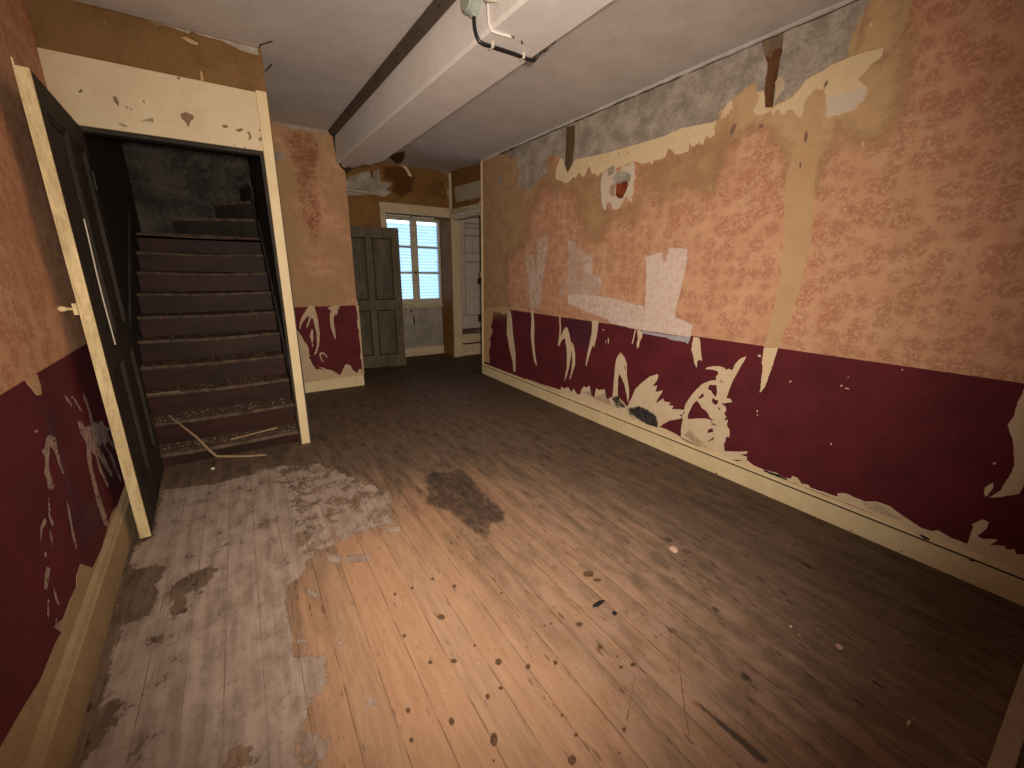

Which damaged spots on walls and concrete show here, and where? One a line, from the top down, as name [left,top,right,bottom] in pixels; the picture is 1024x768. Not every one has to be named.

peeling [180,112,194,127]
flaking render [498,0,872,210]
flaking render [346,169,392,197]
flaking render [390,151,405,164]
peeling [297,305,364,381]
peeling [484,307,516,372]
peeling [25,374,42,395]
peeling [526,315,1024,572]